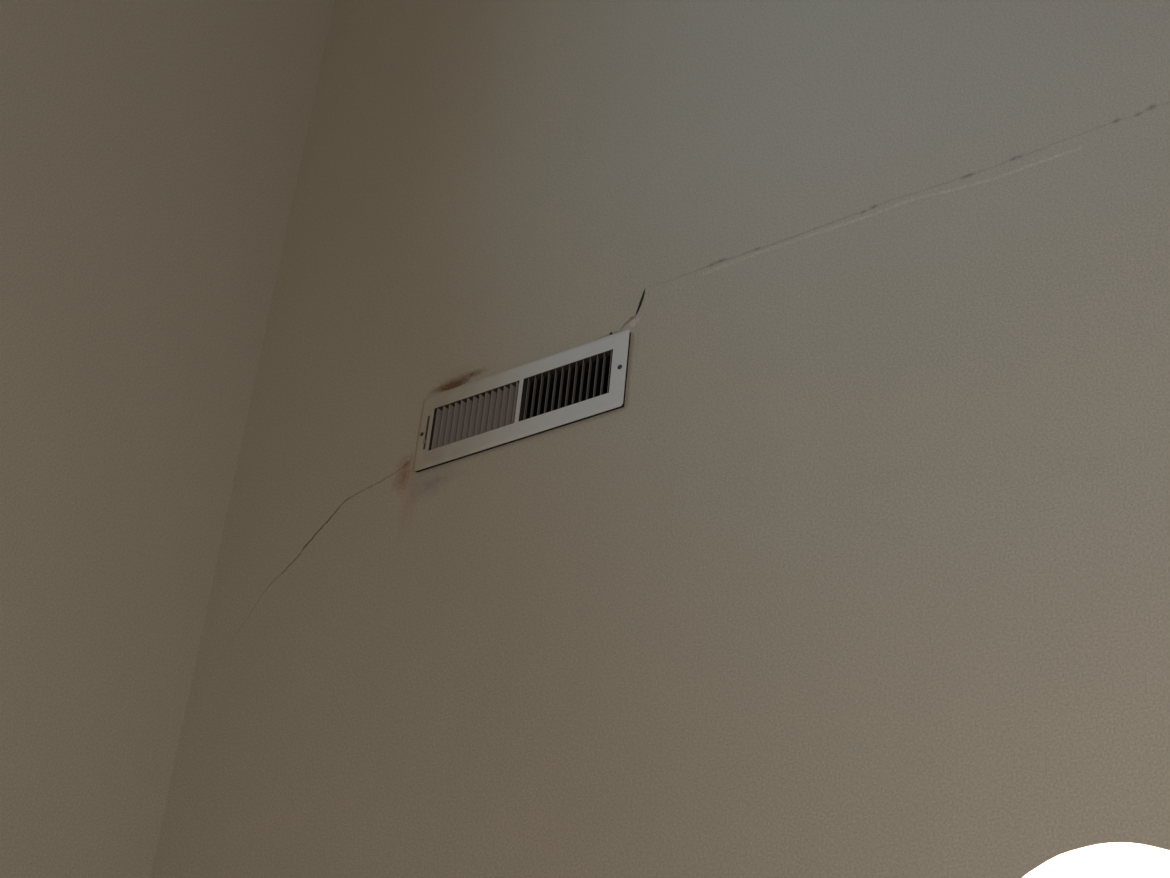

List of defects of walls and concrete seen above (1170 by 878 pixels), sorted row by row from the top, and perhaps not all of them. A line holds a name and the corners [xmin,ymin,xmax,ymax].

crack [610,289,645,335]
crack [284,498,349,571]